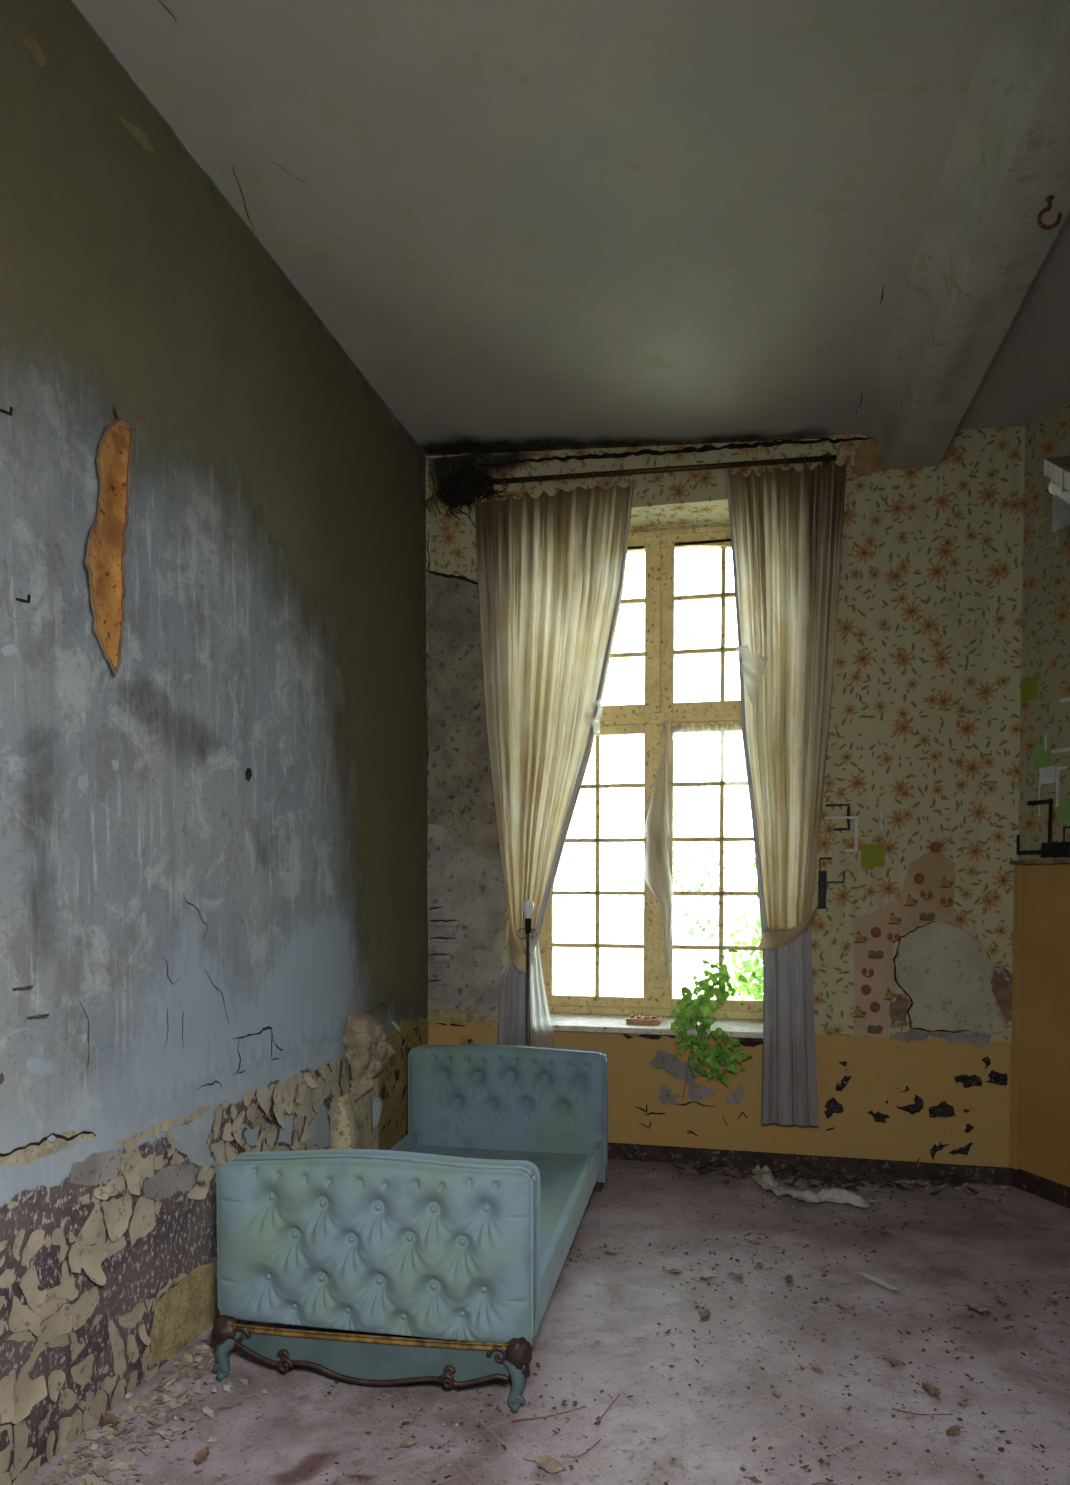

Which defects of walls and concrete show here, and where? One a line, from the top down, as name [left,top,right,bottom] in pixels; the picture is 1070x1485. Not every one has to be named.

peeling [378,1016,428,1150]
peeling [822,1059,852,1118]
peeling [867,1085,974,1162]
peeling [954,1057,1008,1088]
peeling [0,1056,359,1485]